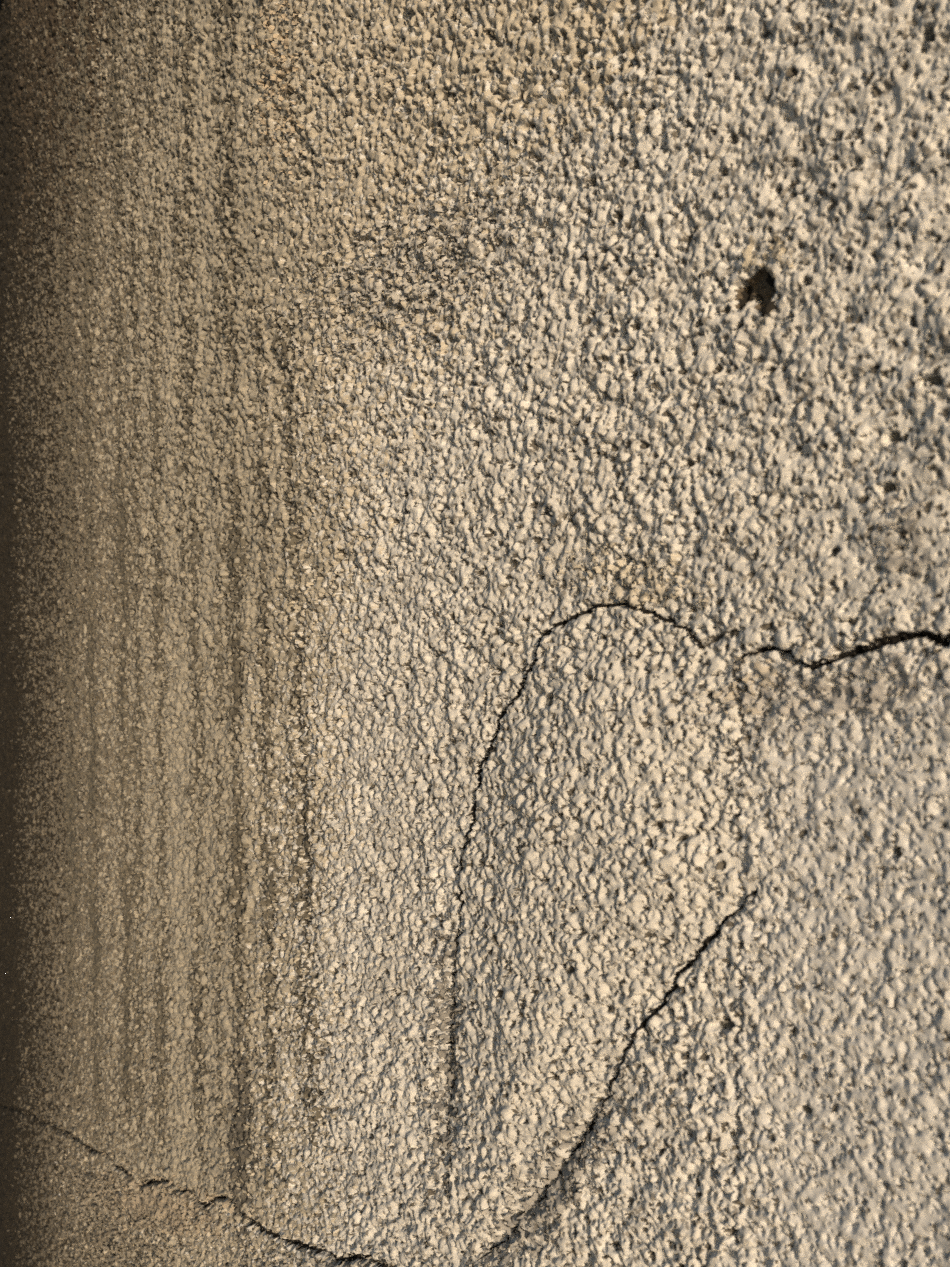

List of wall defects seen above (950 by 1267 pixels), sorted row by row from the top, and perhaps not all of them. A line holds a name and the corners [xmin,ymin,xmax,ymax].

crack [1,1104,391,1267]
crack [284,344,317,1129]
leakage [0,0,740,1267]
crack [477,891,757,1261]
crack [446,603,950,1132]